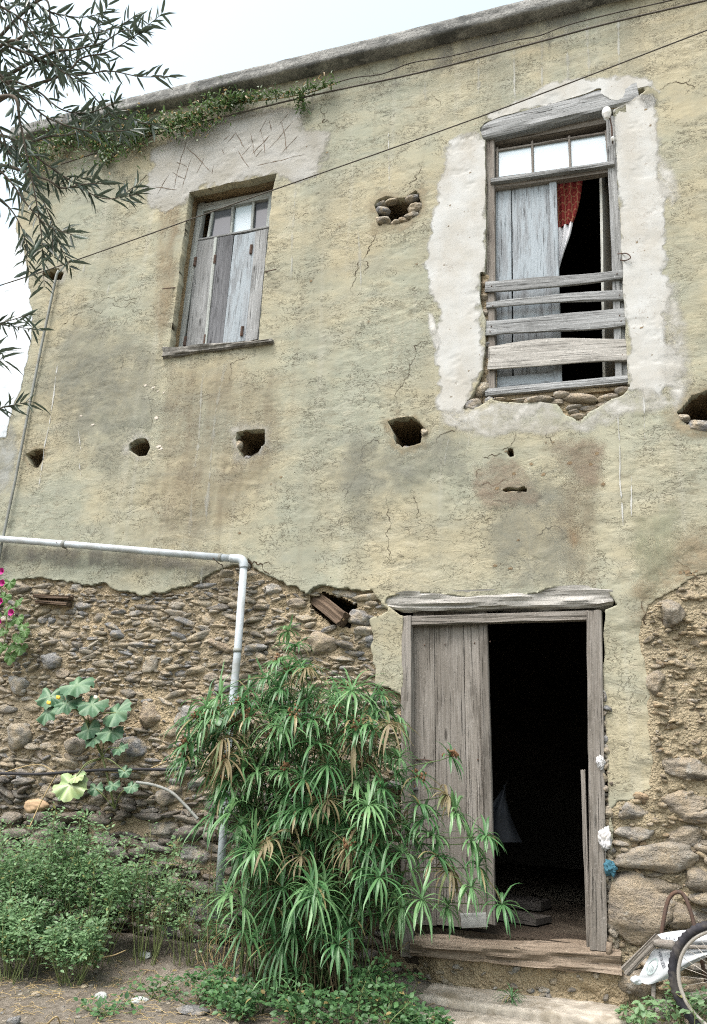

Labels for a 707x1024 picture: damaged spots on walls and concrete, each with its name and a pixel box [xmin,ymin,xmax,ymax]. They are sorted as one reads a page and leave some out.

spalling [231,425,266,459]
spalling [385,416,428,453]
peeling [370,75,707,443]
flaking render [0,562,707,1024]